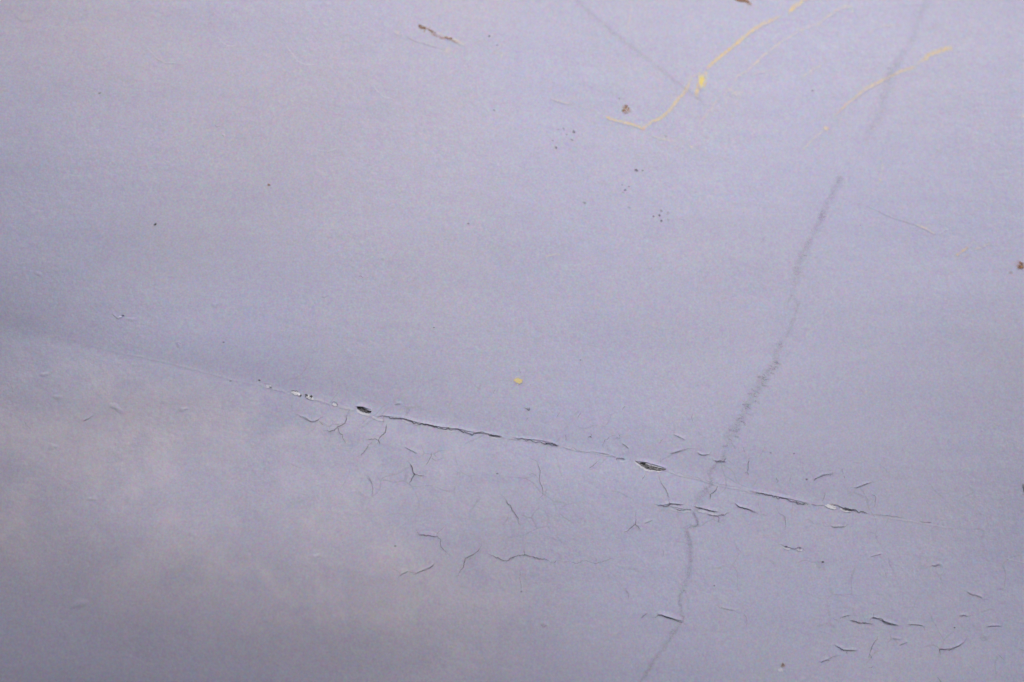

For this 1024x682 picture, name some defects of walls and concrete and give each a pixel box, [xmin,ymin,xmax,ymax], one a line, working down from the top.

crack [85,344,629,497]
hole [355,402,373,416]
spalling [634,458,667,473]
crack [625,433,829,551]
crack [830,481,951,528]
crack [820,615,924,662]